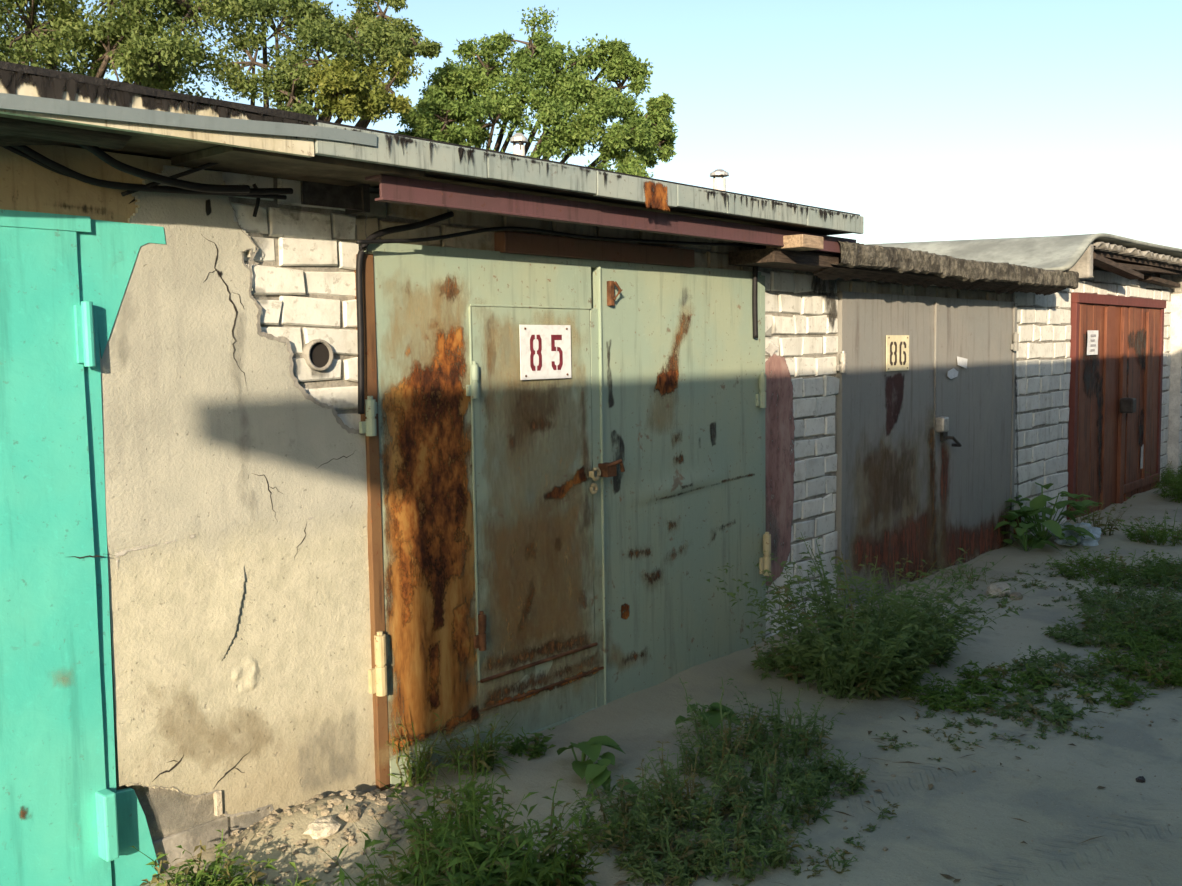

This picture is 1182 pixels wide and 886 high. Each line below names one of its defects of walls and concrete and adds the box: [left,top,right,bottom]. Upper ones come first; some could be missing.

damp [0,69,245,132]
corrosion [643,181,670,210]
crack [201,234,246,381]
flaking render [184,167,368,436]
corrosion [437,277,459,304]
corrosion [655,315,691,396]
crack [252,473,283,520]
corrosion [928,428,1009,571]
corrosion [382,323,599,757]
corrosion [621,603,630,619]
flaking render [129,782,273,817]